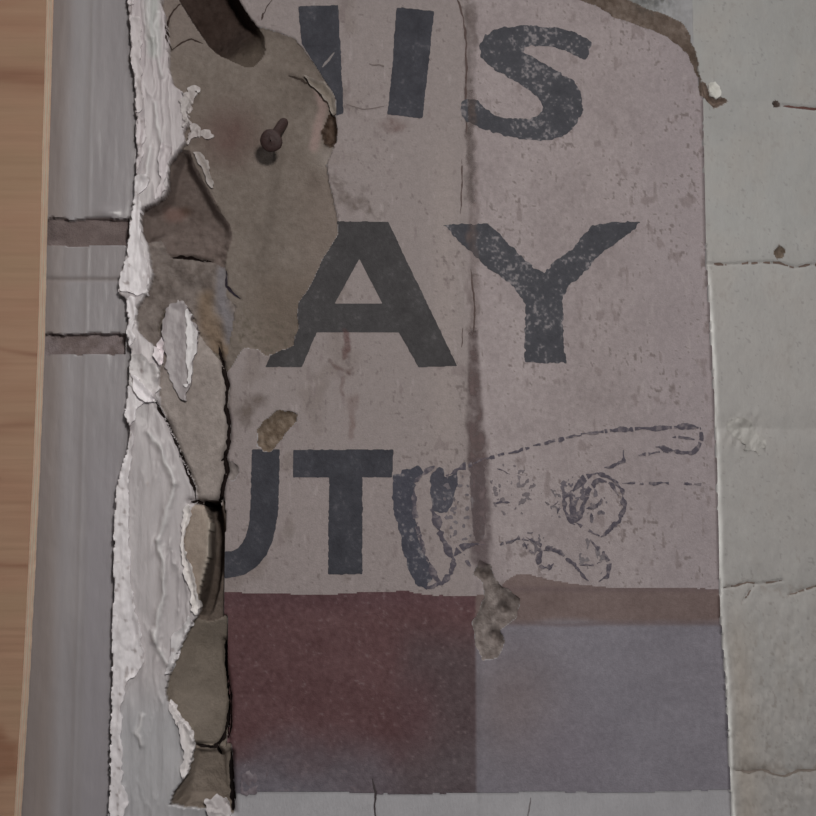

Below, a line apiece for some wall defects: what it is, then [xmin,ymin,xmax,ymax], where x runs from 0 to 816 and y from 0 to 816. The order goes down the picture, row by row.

flaking render [580,0,727,108]
crack [784,103,816,111]
crack [714,260,816,268]
flaking render [108,0,338,816]
damp [467,331,490,566]
crack [723,580,816,598]
crack [735,768,816,777]